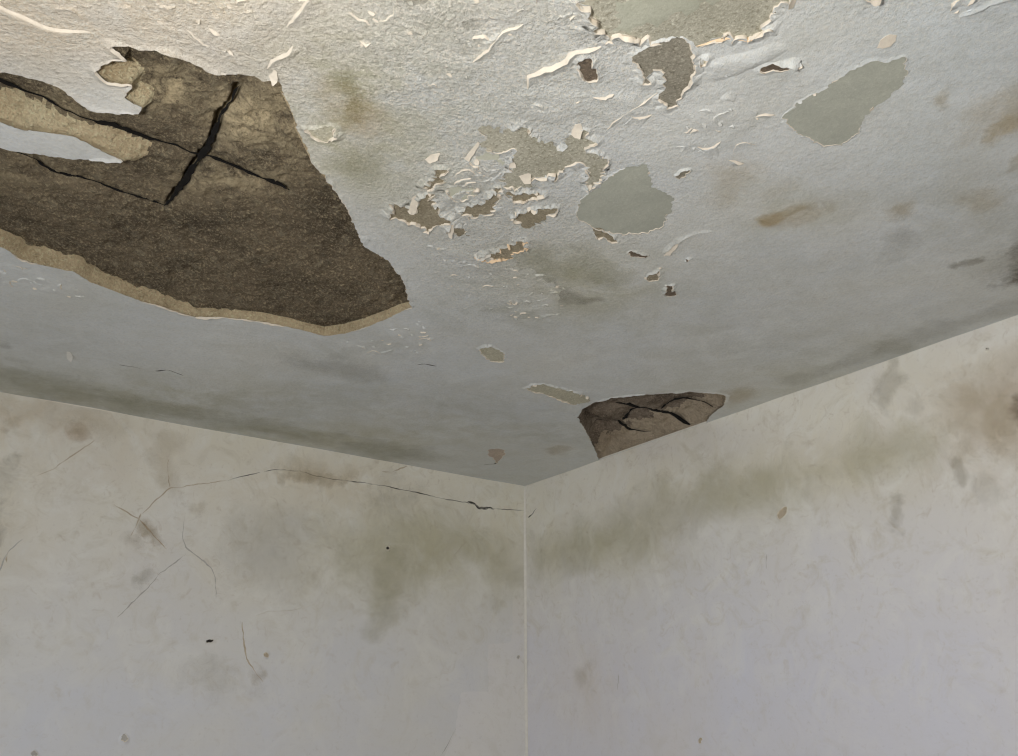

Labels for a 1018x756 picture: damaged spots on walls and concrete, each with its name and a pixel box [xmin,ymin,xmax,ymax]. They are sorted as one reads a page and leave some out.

peeling [568,0,811,114]
peeling [781,34,911,147]
spalling [0,38,415,336]
peeling [379,119,674,264]
peeling [644,244,679,297]
spalling [521,383,732,458]
crack [115,459,536,617]